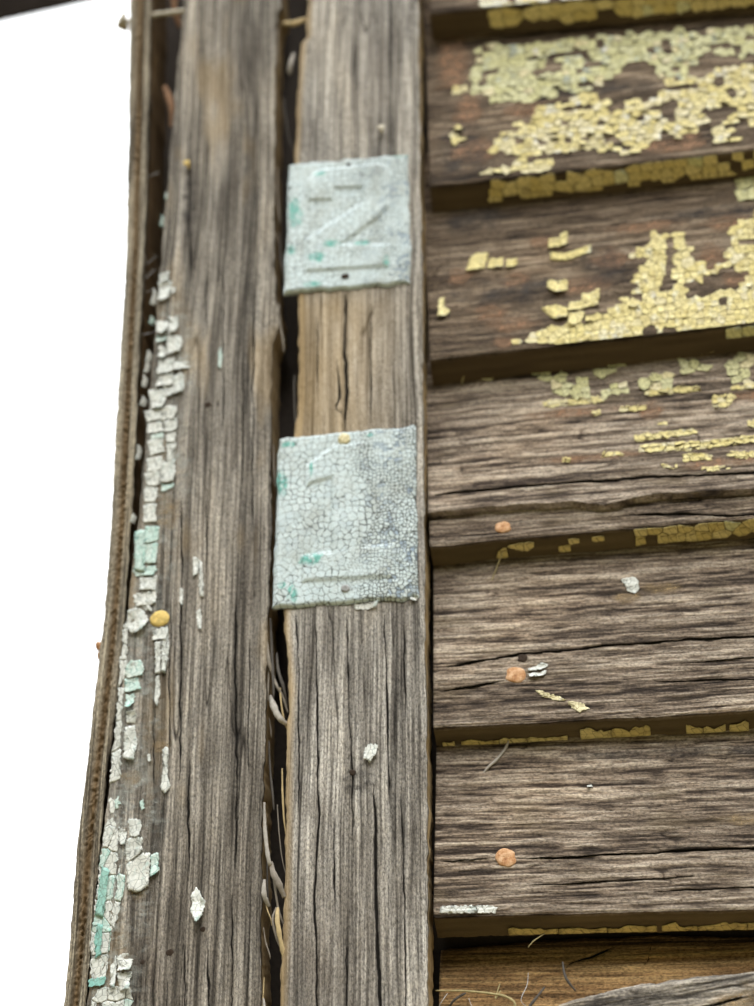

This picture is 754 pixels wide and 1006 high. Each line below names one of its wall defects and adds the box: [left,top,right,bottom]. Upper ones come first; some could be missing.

peeling [479,0,754,28]
peeling [449,25,754,202]
peeling [465,253,518,271]
peeling [511,215,754,345]
peeling [437,297,450,316]
peeling [532,352,754,416]
peeling [634,419,754,472]
peeling [634,518,754,546]
peeling [88,271,190,1006]
peeling [442,735,568,746]
peeling [580,725,651,739]
peeling [508,922,754,935]